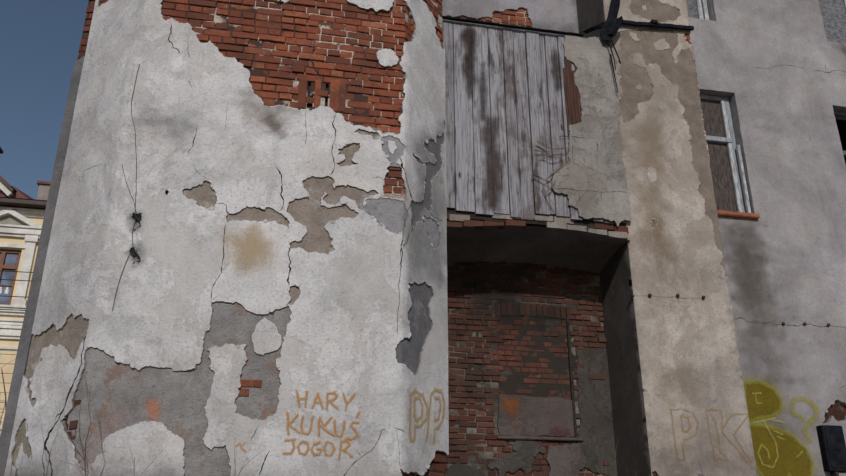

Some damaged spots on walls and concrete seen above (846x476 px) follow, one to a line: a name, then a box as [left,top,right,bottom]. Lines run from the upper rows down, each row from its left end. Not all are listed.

leakage [553,53,561,88]
flaking render [162,0,445,254]
leakage [461,28,502,207]
flaking render [619,0,727,278]
flaking render [396,282,433,375]
crack [737,317,845,328]
flaking render [13,419,32,473]
crack [17,336,86,476]
flaking render [25,282,300,476]
flaking render [402,451,446,476]
flaking render [823,401,846,423]